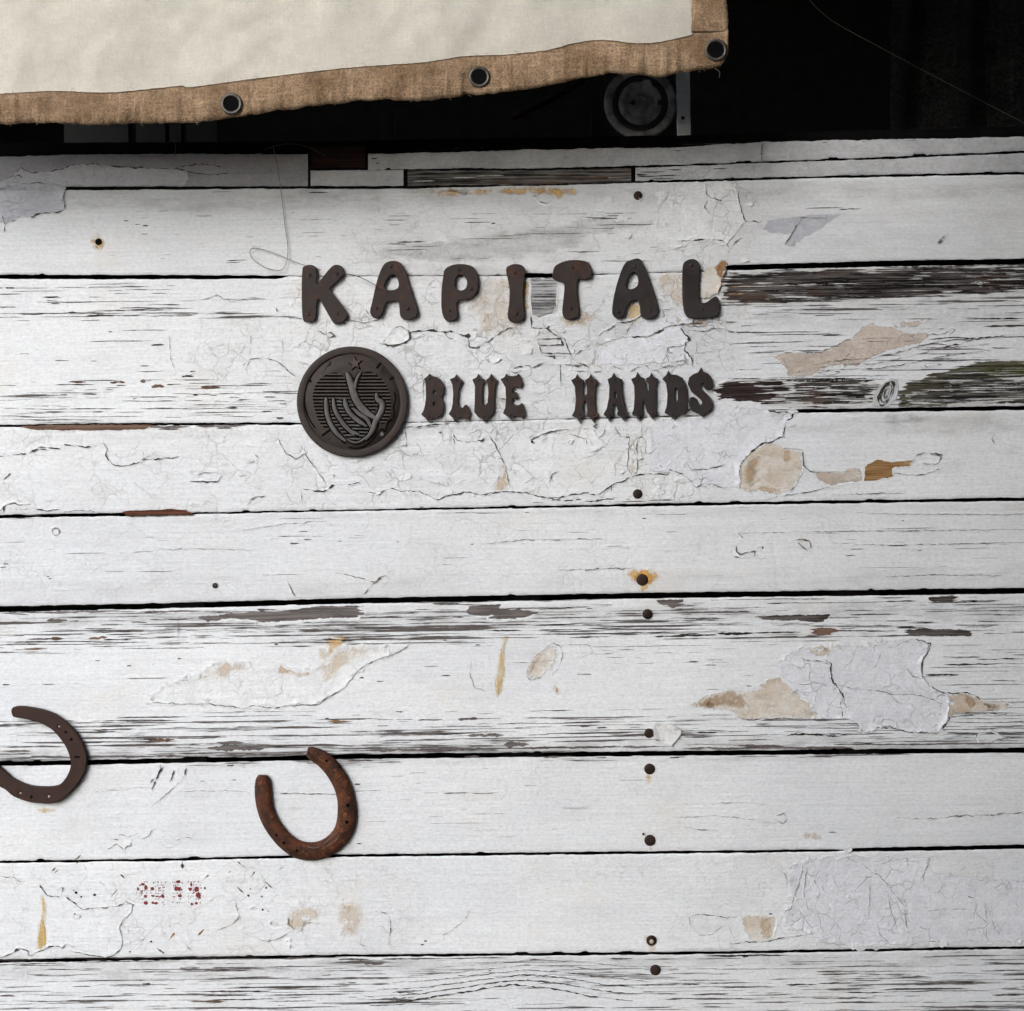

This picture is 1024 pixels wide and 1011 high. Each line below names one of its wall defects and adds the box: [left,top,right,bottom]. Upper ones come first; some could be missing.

peeling [0,164,188,223]
crack [682,184,757,252]
peeling [700,258,1024,407]
peeling [522,321,981,519]
crack [0,443,179,538]
crack [161,423,723,551]
peeling [4,605,367,659]
peeling [88,634,428,766]
corrosion [630,570,657,590]
peeling [349,595,1024,769]
peeling [706,847,1024,969]
peeling [787,971,1024,1011]